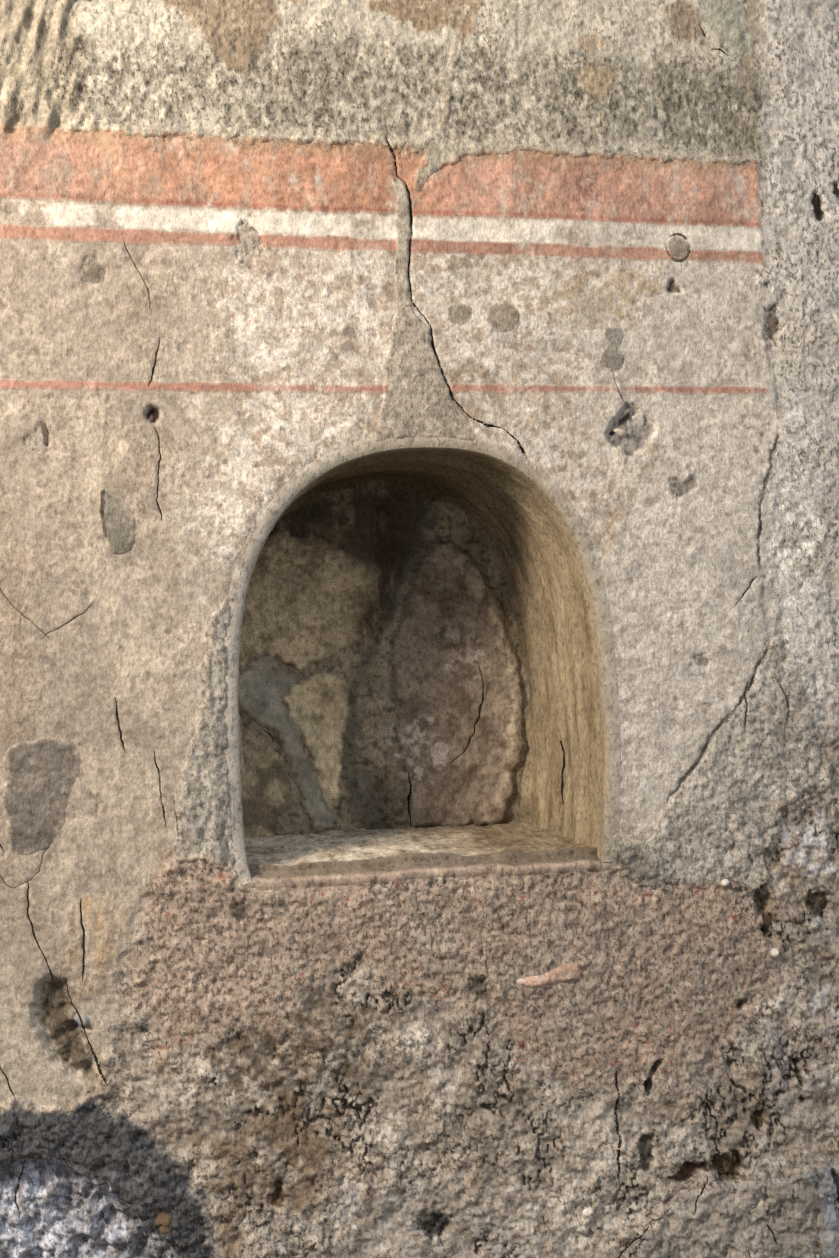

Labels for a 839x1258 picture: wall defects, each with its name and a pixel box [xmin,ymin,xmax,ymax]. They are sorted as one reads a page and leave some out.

leakage [36,0,774,173]
crack [385,136,526,455]
spalling [605,404,656,457]
crack [0,588,91,639]
leakage [64,377,180,717]
crack [733,435,779,607]
crack [666,641,789,803]
leakage [25,737,177,989]